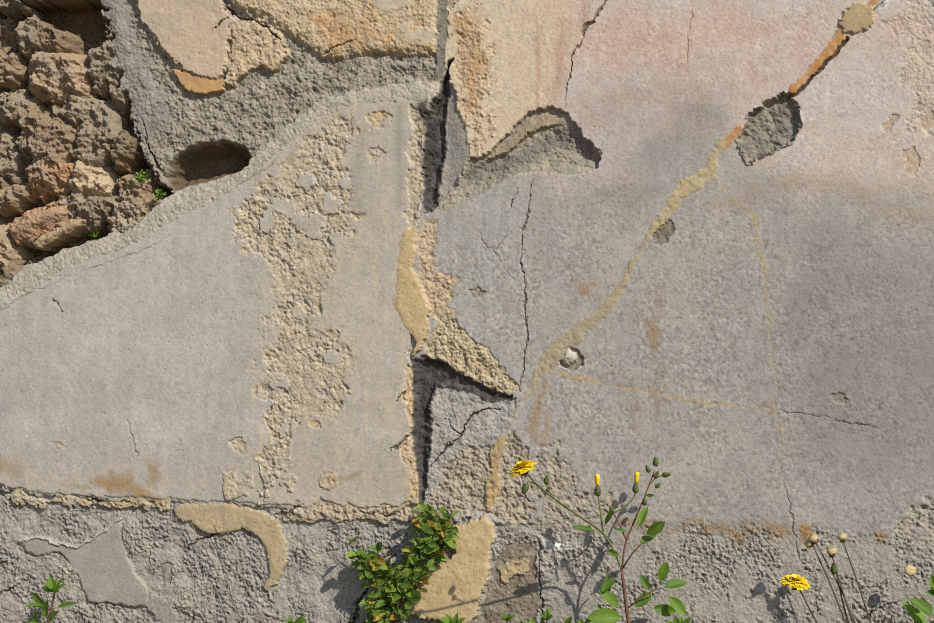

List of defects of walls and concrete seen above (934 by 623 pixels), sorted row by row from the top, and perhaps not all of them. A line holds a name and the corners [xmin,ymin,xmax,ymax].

crack [867,0,885,12]
crack [566,0,608,92]
crack [788,29,849,101]
crack [422,60,454,214]
flaking render [223,105,628,542]
crack [390,126,878,562]
flaking render [11,487,172,513]
crack [79,496,130,504]
crack [275,504,304,516]
flaking render [893,497,934,552]
flaking render [477,540,543,623]